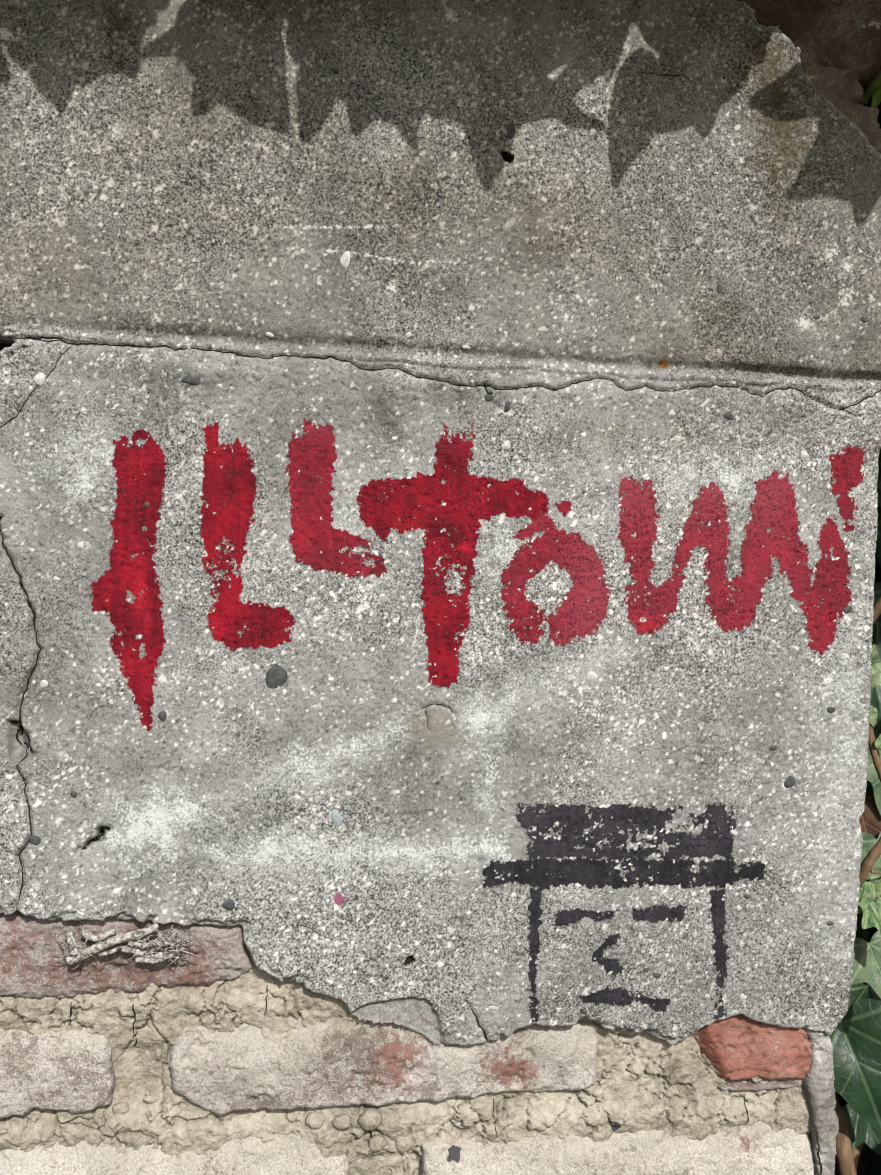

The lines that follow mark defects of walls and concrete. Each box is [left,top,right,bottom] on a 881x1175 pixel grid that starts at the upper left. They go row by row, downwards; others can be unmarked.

crack [0,336,881,428]
spalling [349,996,445,1092]
peeling [481,1045,545,1089]